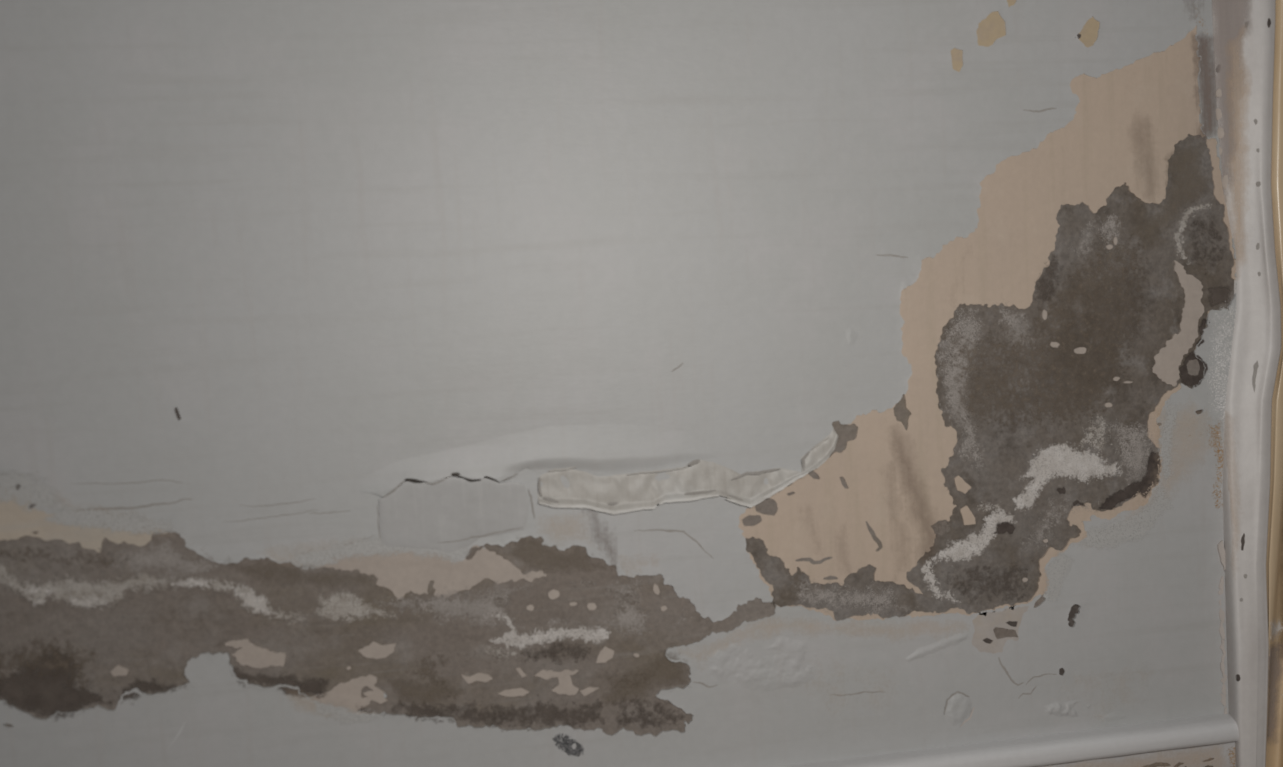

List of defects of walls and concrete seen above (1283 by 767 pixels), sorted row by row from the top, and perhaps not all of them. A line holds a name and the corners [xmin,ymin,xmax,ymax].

peeling [976,0,1016,47]
peeling [1075,17,1099,47]
peeling [739,26,1205,589]
spalling [0,134,1235,736]
damp [920,209,1178,603]
crack [54,479,192,515]
crack [223,473,518,550]
damp [0,499,695,664]
damp [0,641,175,717]
damp [234,670,328,696]
damp [400,658,602,726]